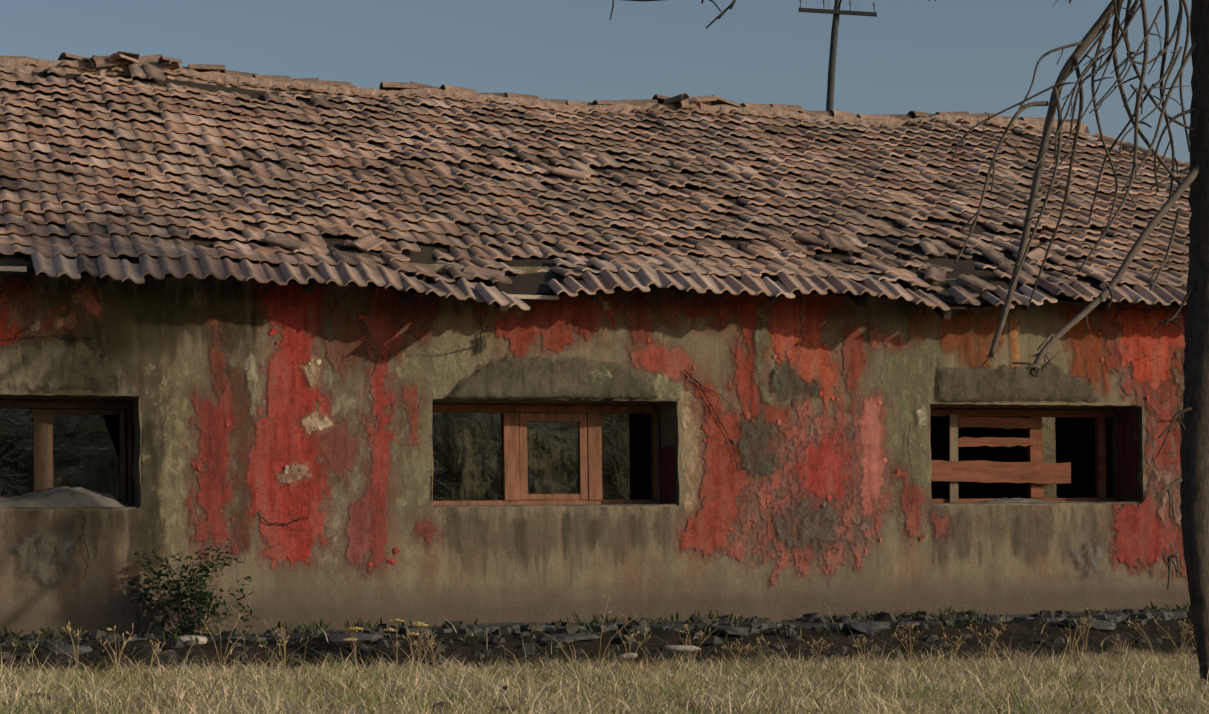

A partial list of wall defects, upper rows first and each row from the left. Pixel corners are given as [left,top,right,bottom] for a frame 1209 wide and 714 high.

peeling [0,280,103,348]
crack [256,512,309,531]
peeling [183,281,440,578]
peeling [456,289,950,587]
peeling [1072,303,1187,579]